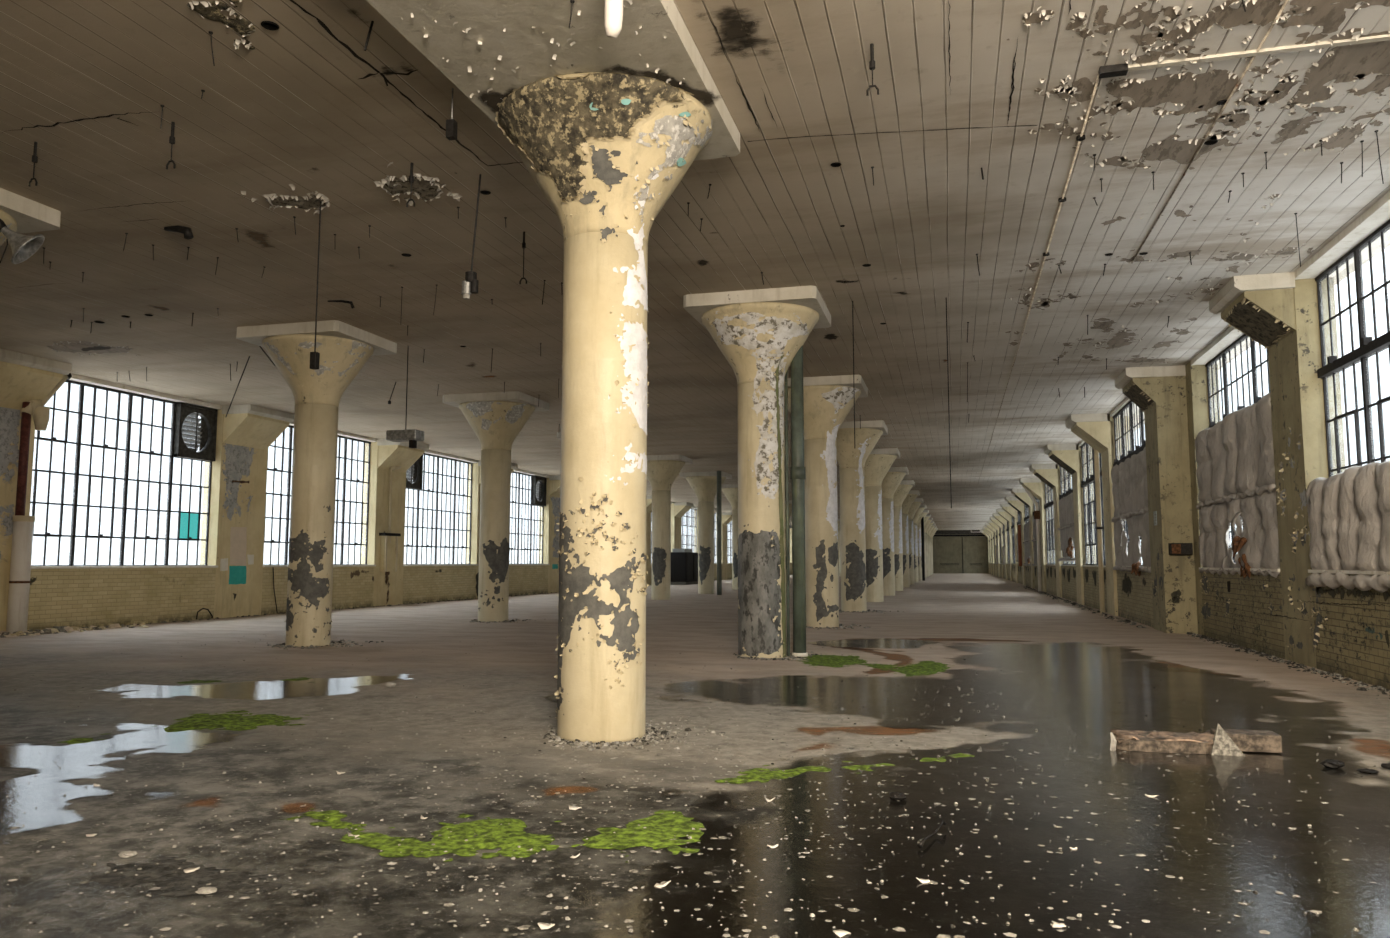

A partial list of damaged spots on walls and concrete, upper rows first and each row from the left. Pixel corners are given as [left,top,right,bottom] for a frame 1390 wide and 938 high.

spalling [186,0,256,50]
crack [289,0,522,166]
leakage [718,7,768,54]
peeling [1021,0,1390,171]
spalling [373,162,463,206]
spalling [457,27,722,718]
peeling [707,307,809,499]
peeling [0,407,21,563]
peeling [284,505,333,646]
peeling [733,524,786,657]
peeling [812,386,921,625]